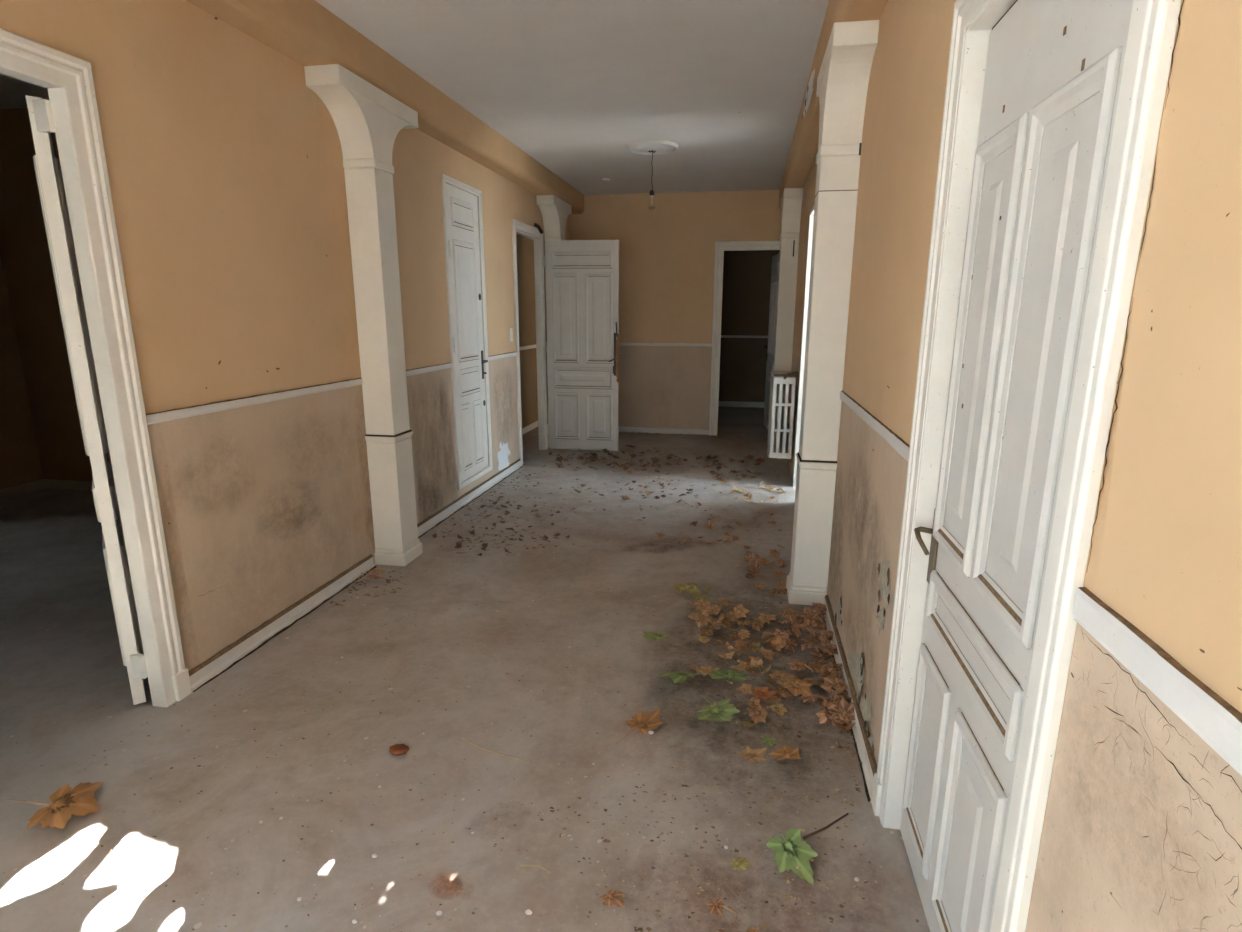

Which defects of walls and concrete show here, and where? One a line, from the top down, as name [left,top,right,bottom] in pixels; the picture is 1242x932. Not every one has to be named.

crack [1072,633,1242,931]